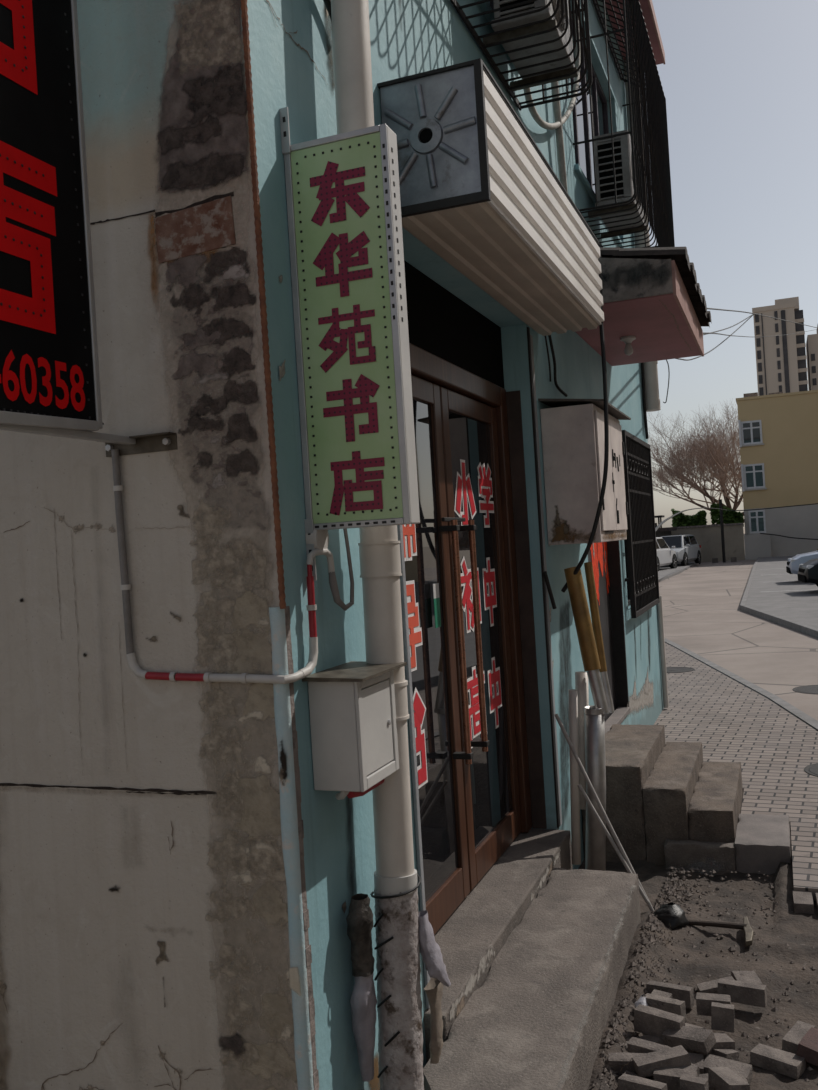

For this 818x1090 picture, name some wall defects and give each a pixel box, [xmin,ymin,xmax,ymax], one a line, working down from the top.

crack [0,508,234,795]
spalling [156,0,297,1090]
crack [41,1025,120,1090]
crack [154,1046,213,1090]